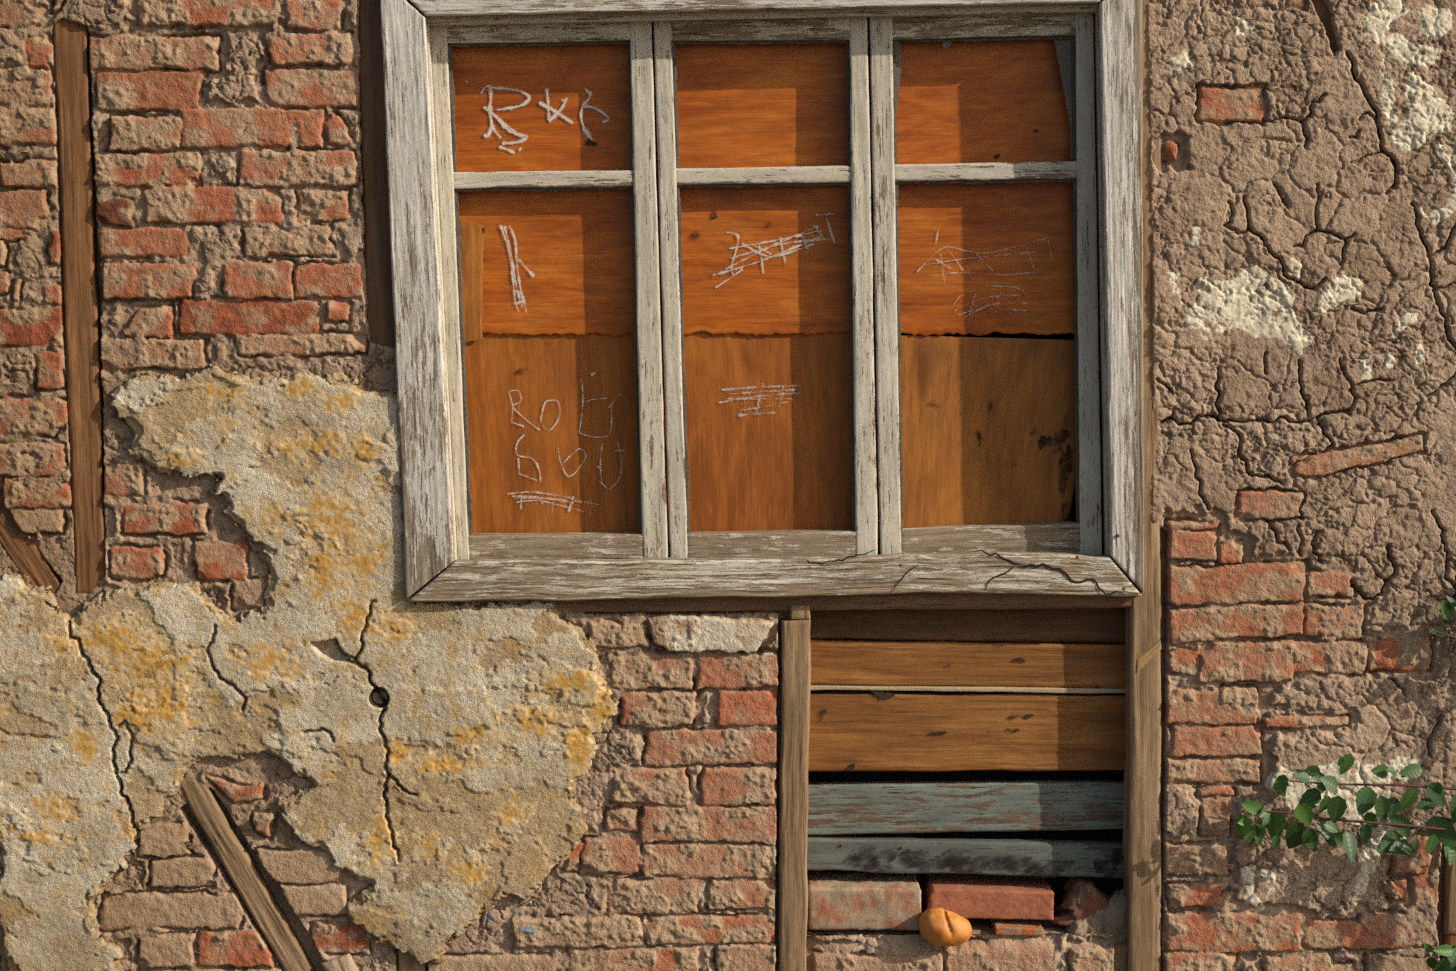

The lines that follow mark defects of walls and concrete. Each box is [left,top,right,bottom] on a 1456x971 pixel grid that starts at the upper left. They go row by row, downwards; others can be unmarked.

crack [1262,98,1320,147]
crack [1225,184,1354,290]
crack [1346,53,1456,396]
flaking render [0,0,784,971]
crack [1160,354,1386,509]
crack [1265,520,1320,562]
crack [1350,545,1395,600]
crack [1431,510,1456,597]
crack [70,623,136,826]
crack [208,627,245,707]
crack [337,601,417,860]
spalling [1160,432,1447,971]